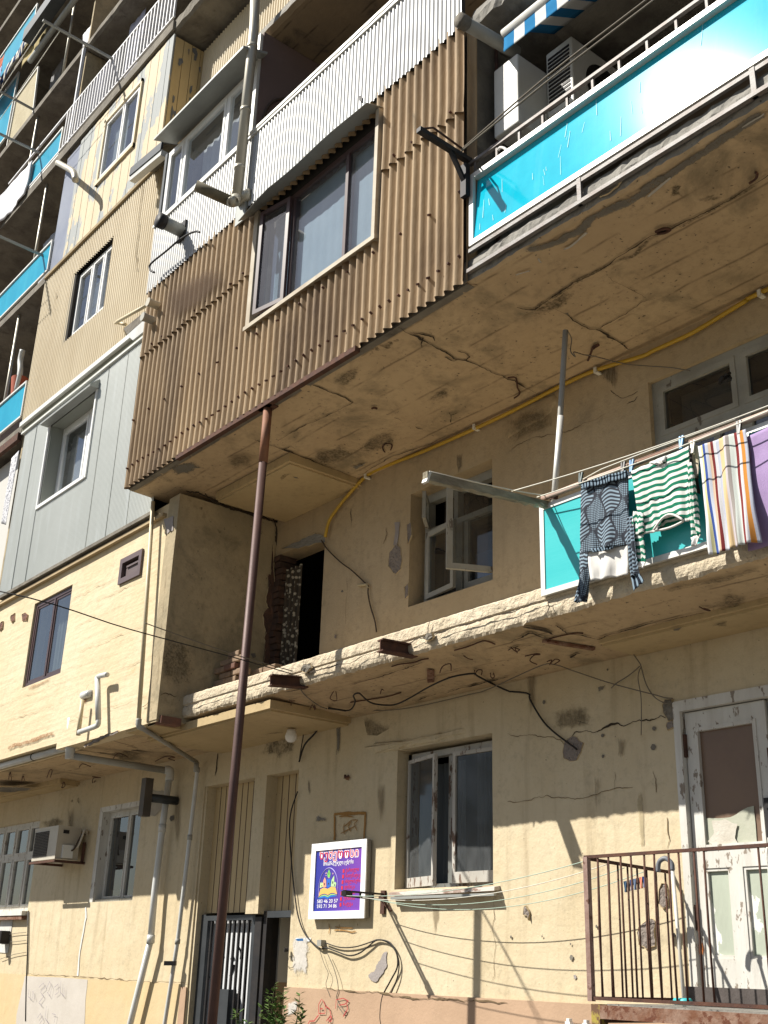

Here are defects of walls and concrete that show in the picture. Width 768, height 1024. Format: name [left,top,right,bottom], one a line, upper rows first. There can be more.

crack [517,175,768,350]
crack [398,327,532,391]
spalling [388,522,413,574]
crack [508,715,665,742]
spalling [562,736,584,761]
crack [508,773,657,803]
spalling [637,919,656,950]
peeling [368,952,387,982]